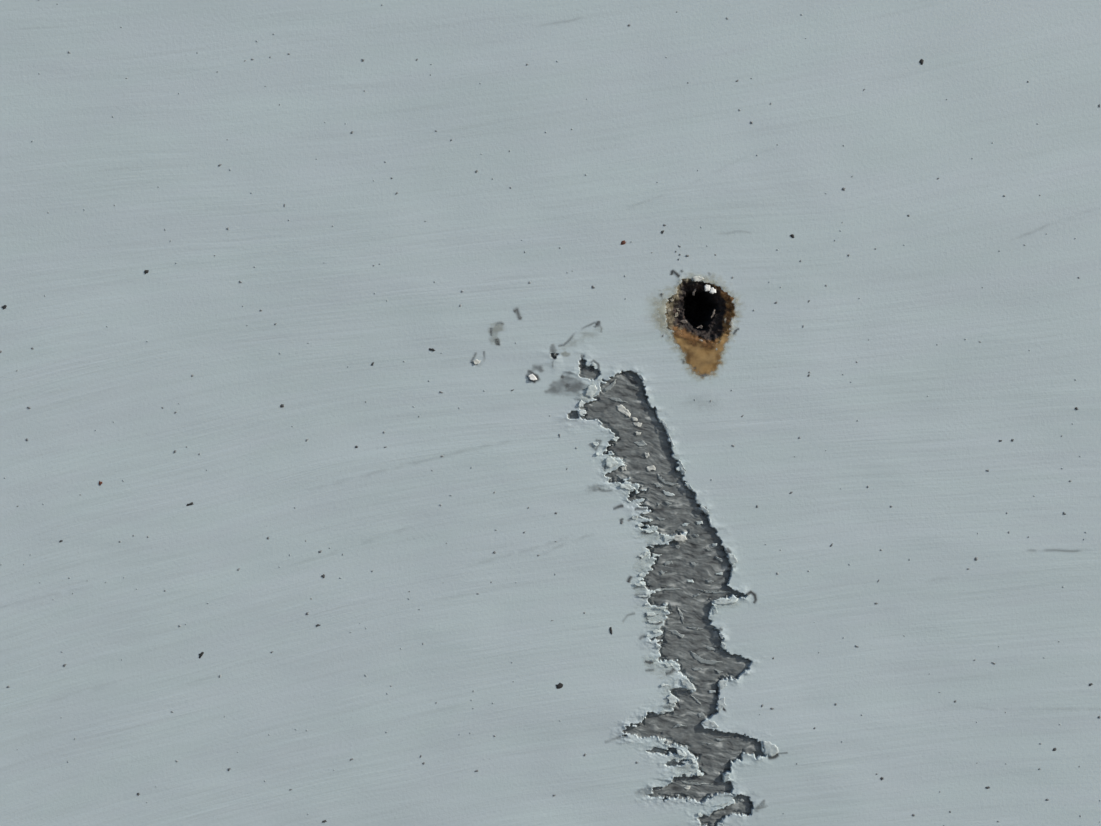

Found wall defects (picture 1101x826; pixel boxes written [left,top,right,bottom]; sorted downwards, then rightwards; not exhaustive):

rust [658,300,737,376]
peeling [568,358,779,826]